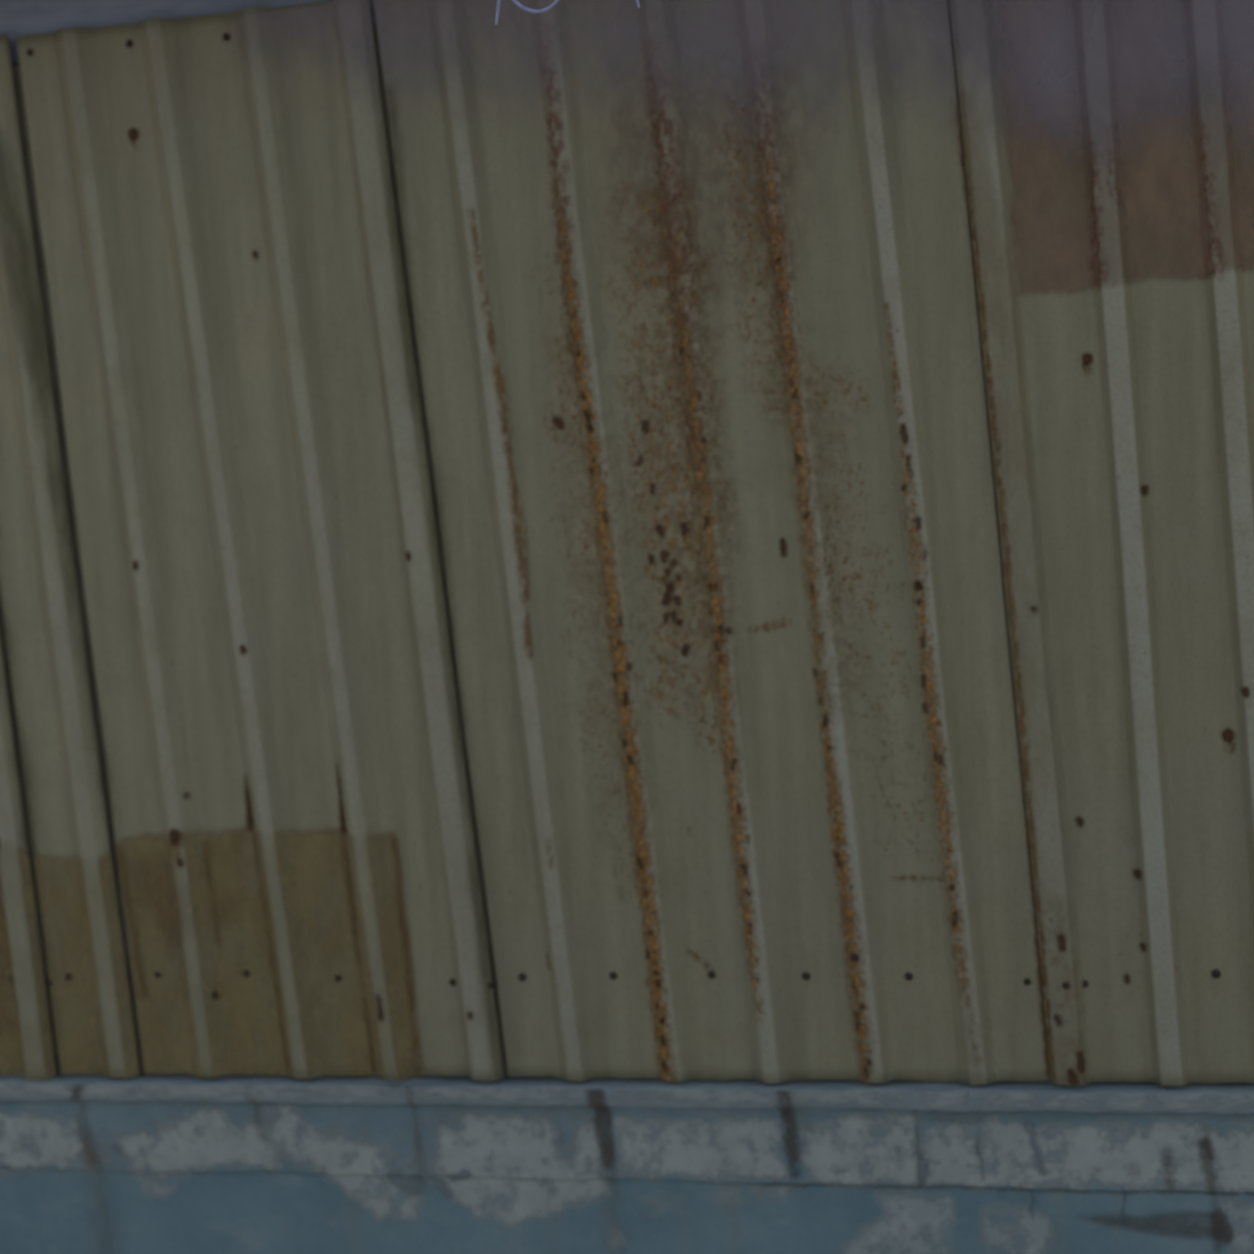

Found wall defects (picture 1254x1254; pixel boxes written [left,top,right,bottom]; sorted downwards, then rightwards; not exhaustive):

damp [269,0,562,58]
damp [596,0,1254,291]
corrosion [544,38,675,1081]
corrosion [623,38,764,1019]
corrosion [726,65,872,1083]
corrosion [885,304,969,999]
corrosion [956,108,1085,1085]
damp [0,872,26,1076]
damp [18,851,110,1094]
damp [99,830,419,1080]
peeling [0,1083,1254,1251]
damp [1093,1212,1232,1243]